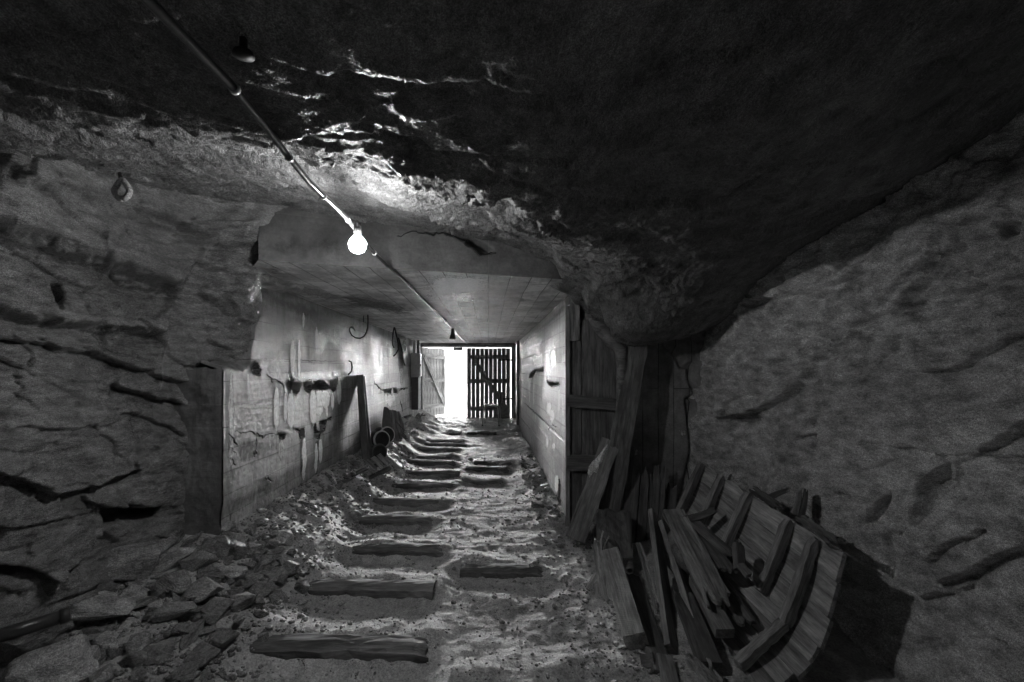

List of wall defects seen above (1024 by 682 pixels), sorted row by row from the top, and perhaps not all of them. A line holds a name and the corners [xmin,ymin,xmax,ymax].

crack [397,231,496,255]
spalling [287,360,353,396]
spalling [277,416,332,440]
crack [228,430,274,465]